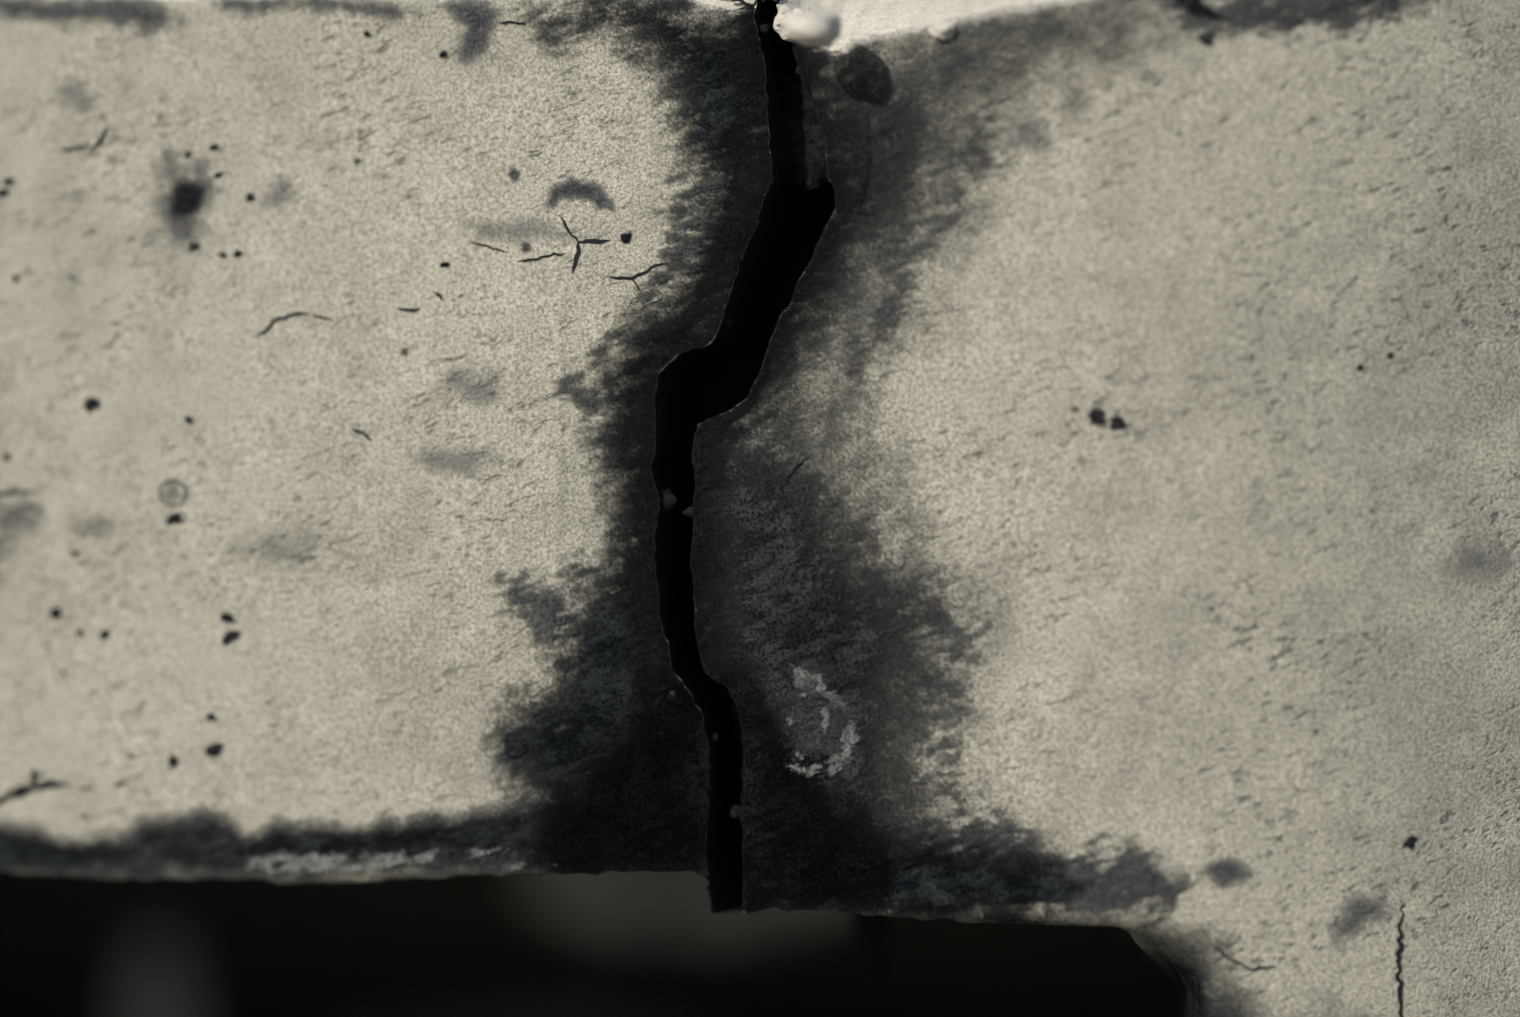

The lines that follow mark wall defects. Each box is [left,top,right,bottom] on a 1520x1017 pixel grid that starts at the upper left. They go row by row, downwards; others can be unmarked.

water stain [0,0,182,34]
water stain [221,0,773,880]
crack [651,0,869,915]
water stain [690,0,1146,924]
water stain [0,835,113,869]
water stain [1130,920,1262,1017]
crack [1395,895,1405,1017]